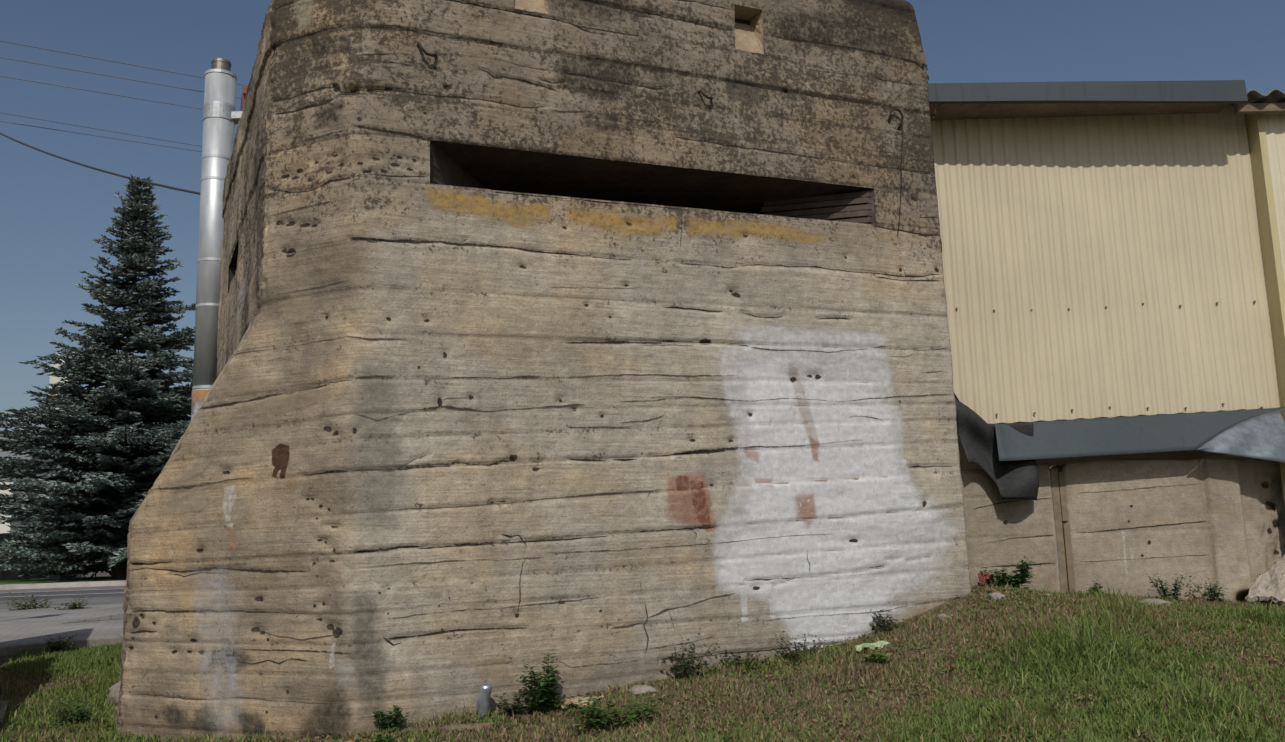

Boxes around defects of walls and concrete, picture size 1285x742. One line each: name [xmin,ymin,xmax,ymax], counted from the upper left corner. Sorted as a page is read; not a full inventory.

crack [350,237,629,289]
crack [225,254,408,355]
rust [191,390,209,407]
crack [197,375,385,410]
rust [272,444,290,478]
crack [142,477,254,490]
crack [306,306,966,668]
rust [669,475,712,529]
crack [131,561,305,577]
crack [130,610,350,664]
crack [132,694,346,704]